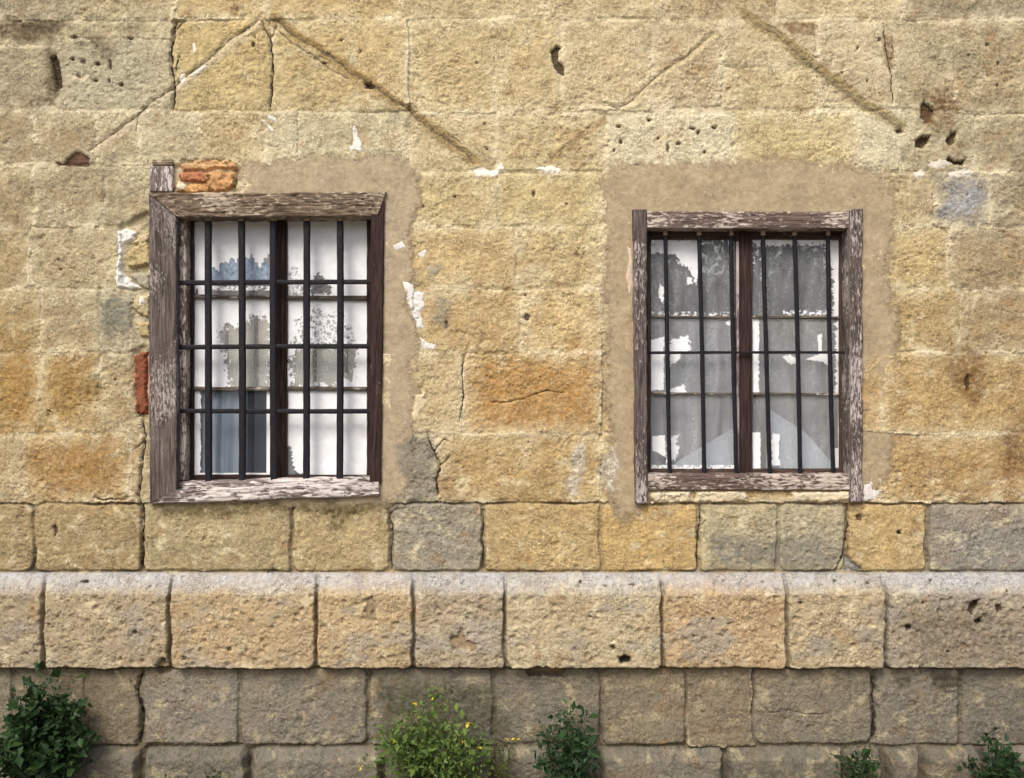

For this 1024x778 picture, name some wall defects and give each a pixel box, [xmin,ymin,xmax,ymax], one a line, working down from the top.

flaking render [175,159,240,193]
spalling [116,228,150,338]
peeling [403,282,437,349]
flaking render [134,351,150,416]
crack [427,361,464,492]
crack [492,390,562,403]